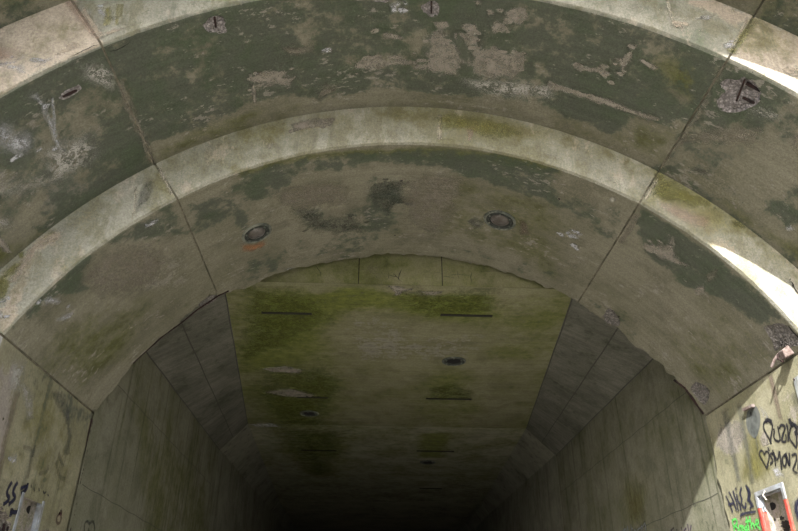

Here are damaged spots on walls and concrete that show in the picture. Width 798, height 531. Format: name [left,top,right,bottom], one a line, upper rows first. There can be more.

spalling [203,16,227,34]
peeling [355,0,528,79]
spalling [699,77,761,113]
leakage [0,130,42,162]
spalling [764,323,798,351]
spalling [0,504,11,531]